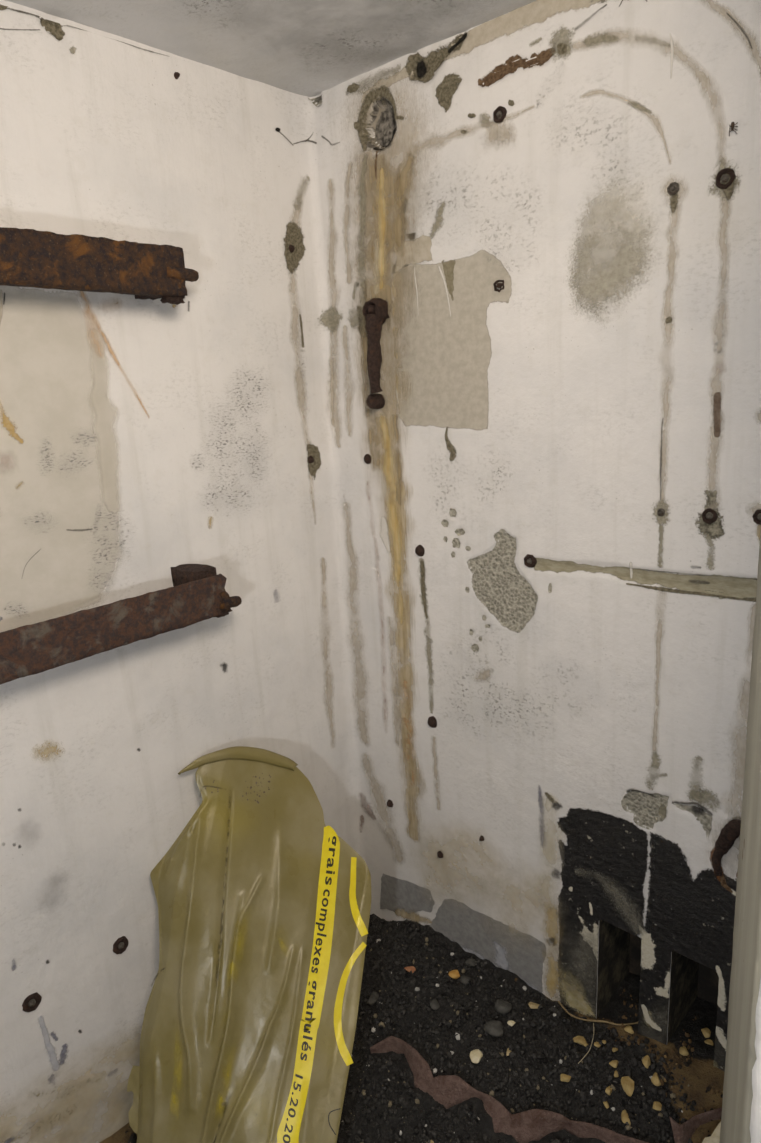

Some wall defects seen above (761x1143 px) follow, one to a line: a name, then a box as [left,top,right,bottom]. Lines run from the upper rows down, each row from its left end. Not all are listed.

peeling [347,0,623,151]
peeling [391,235,511,461]
spalling [441,508,552,652]
spalling [621,789,719,838]
spalling [701,1028,713,1045]